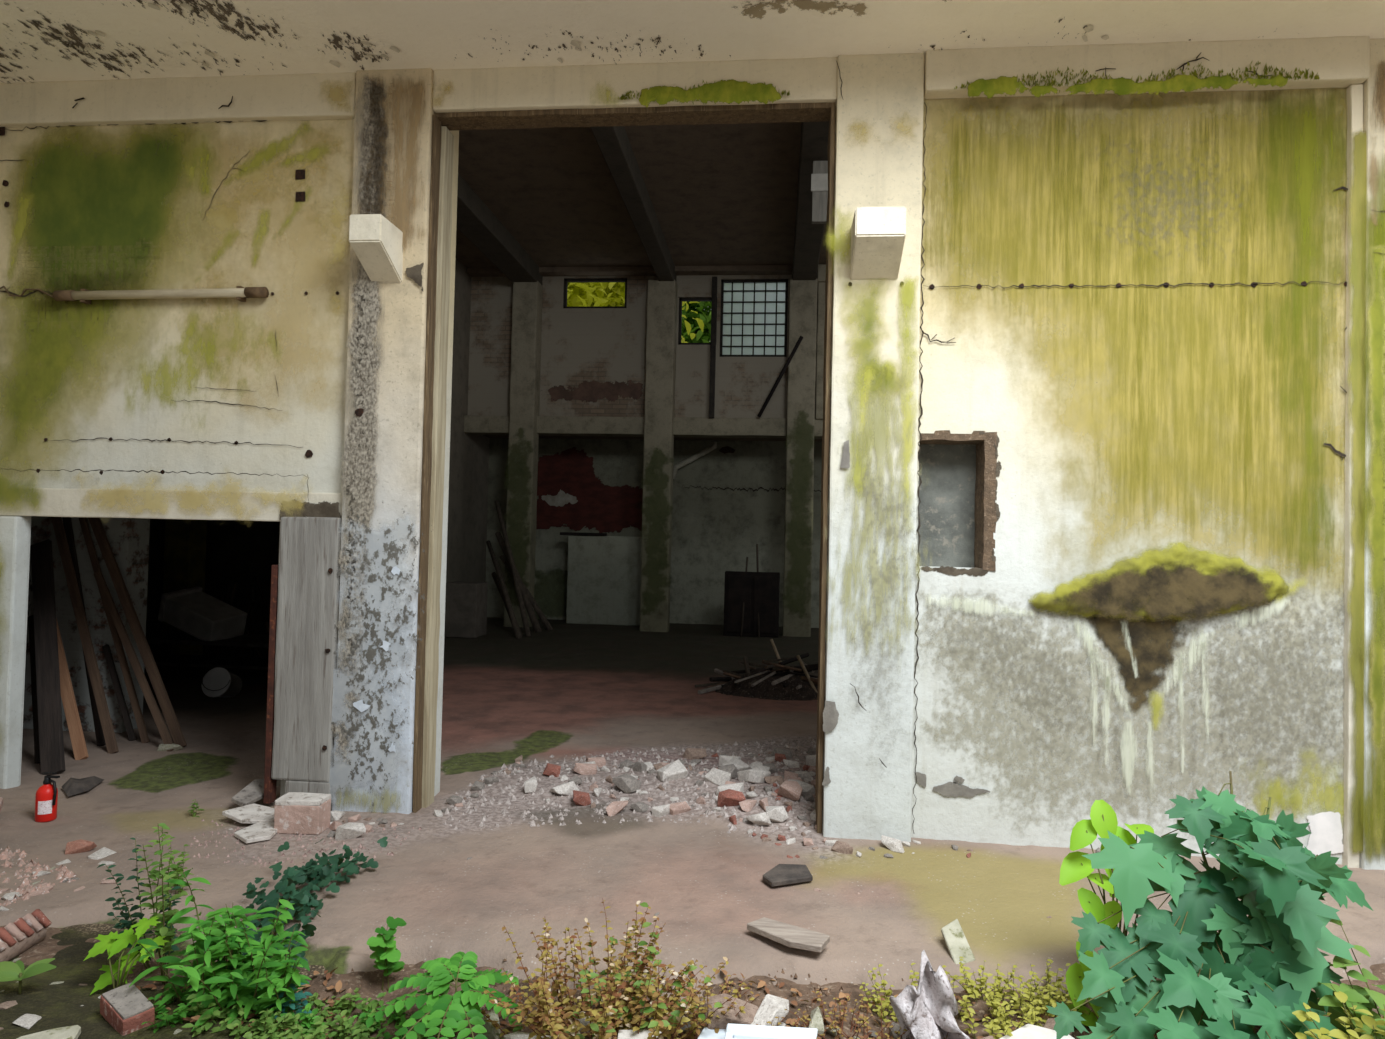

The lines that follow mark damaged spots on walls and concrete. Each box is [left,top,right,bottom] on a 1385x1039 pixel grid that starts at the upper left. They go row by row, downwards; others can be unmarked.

leakage [7,78,425,389]
spalling [318,31,400,215]
peeling [280,262,432,813]
peeling [536,447,643,533]
leakage [831,99,1385,859]